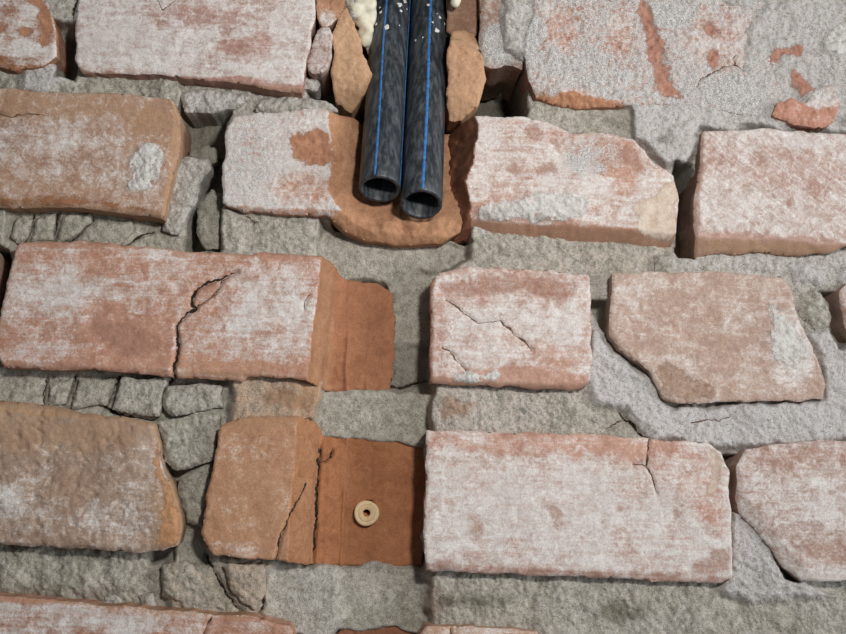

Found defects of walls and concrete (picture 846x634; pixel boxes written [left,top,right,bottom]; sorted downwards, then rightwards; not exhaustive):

spalling [637,0,684,99]
spalling [704,22,717,37]
spalling [707,49,719,69]
crack [696,55,743,88]
spalling [769,45,803,65]
spalling [790,70,816,97]
crack [169,273,235,384]
crack [448,301,532,352]
crack [104,375,158,421]
crack [606,412,656,490]
crack [276,448,333,559]